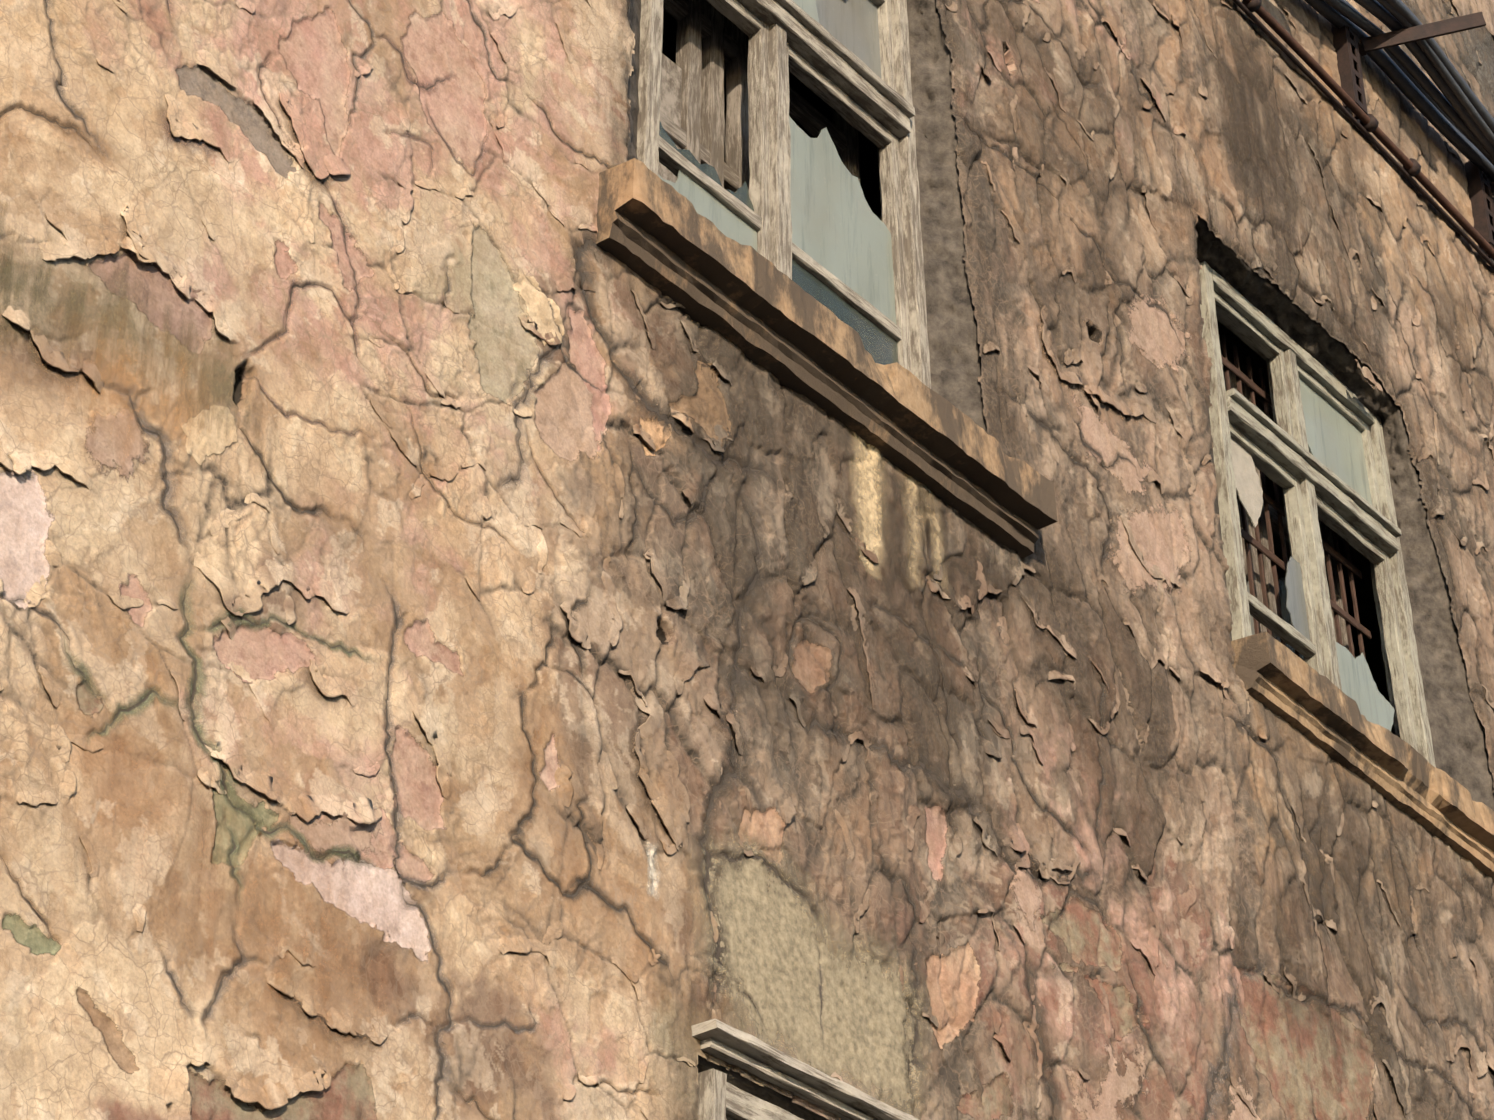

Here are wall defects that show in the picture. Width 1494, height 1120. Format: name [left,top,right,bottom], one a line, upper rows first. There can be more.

crack [0,0,96,145]
peeling [164,7,474,294]
crack [349,0,484,176]
peeling [0,304,150,610]
crack [240,188,507,541]
peeling [443,224,626,520]
peeling [162,1044,377,1120]
peeling [197,705,452,963]
crack [0,585,669,1120]
crack [502,234,818,1009]
crack [788,605,1125,931]
peeling [906,804,1014,1120]